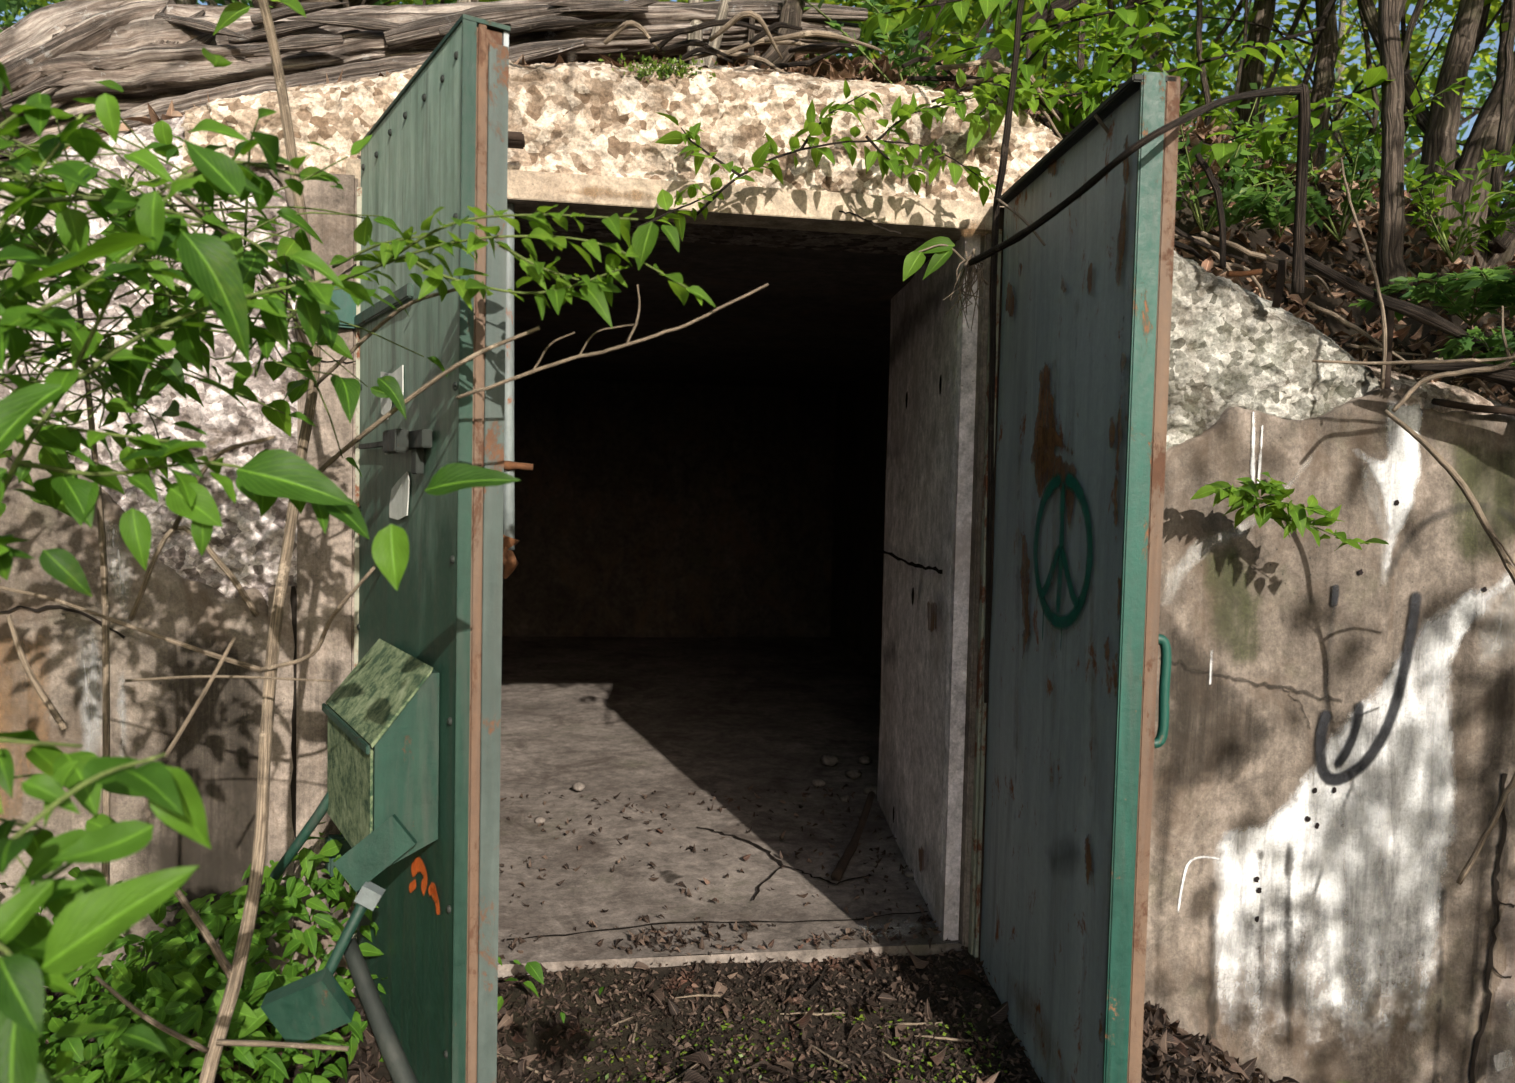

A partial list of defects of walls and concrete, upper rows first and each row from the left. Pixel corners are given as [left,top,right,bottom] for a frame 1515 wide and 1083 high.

spalling [508,60,1062,203]
spalling [0,65,421,605]
rust [1031,362,1076,528]
spalling [1166,251,1515,451]
crack [873,549,943,574]
leakage [143,637,258,968]
crack [507,827,928,940]
leakage [1161,628,1265,881]
crack [1160,657,1341,729]
leakage [1209,593,1485,1083]
leakage [1469,673,1513,1082]